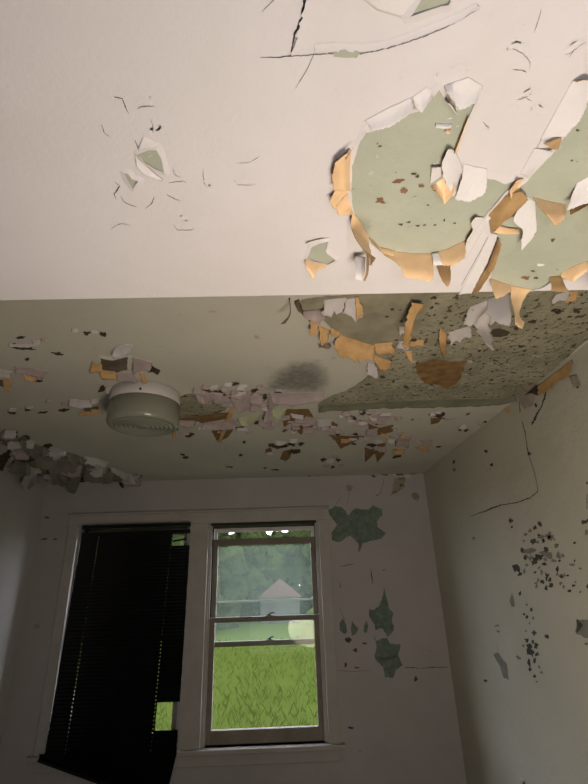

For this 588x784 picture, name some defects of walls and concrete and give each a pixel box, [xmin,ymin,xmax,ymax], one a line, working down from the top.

peeling [288,0,480,58]
peeling [173,51,588,471]
peeling [0,336,48,392]
peeling [7,343,161,416]
peeling [0,429,143,494]
crack [470,392,550,517]
peeling [328,505,386,552]
flaking render [512,521,588,593]
peeling [340,585,403,679]
flaking render [494,648,509,680]
flaking render [516,604,549,683]
flaking render [575,619,588,645]